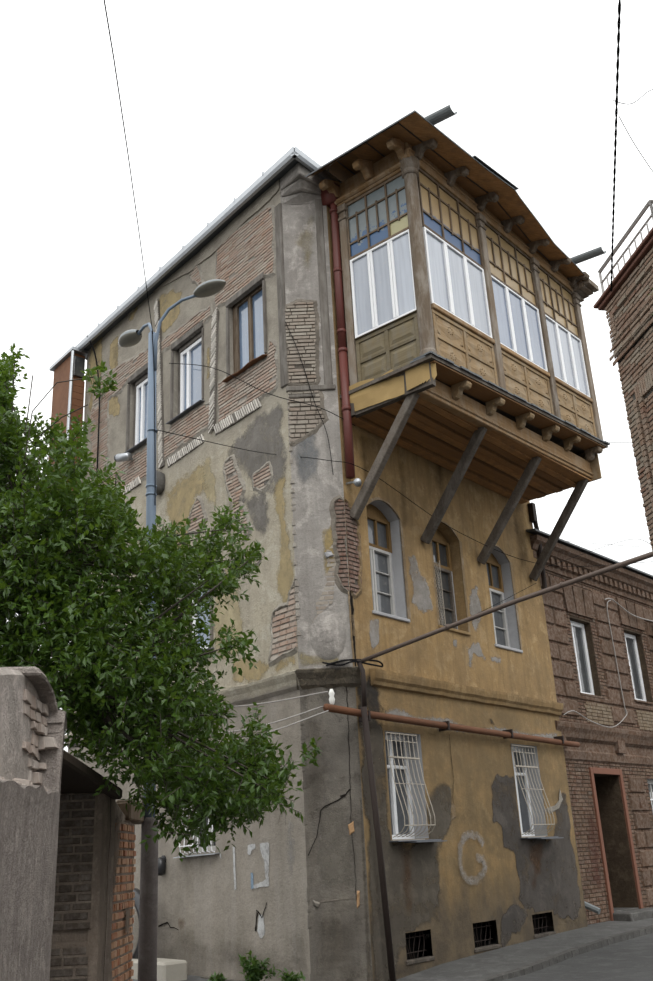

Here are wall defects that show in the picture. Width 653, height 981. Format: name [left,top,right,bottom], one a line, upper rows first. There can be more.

flaking render [88,180,329,498]
flaking render [166,454,338,683]
flaking render [313,495,363,622]
peeling [408,555,433,613]
flaking render [257,915,265,938]